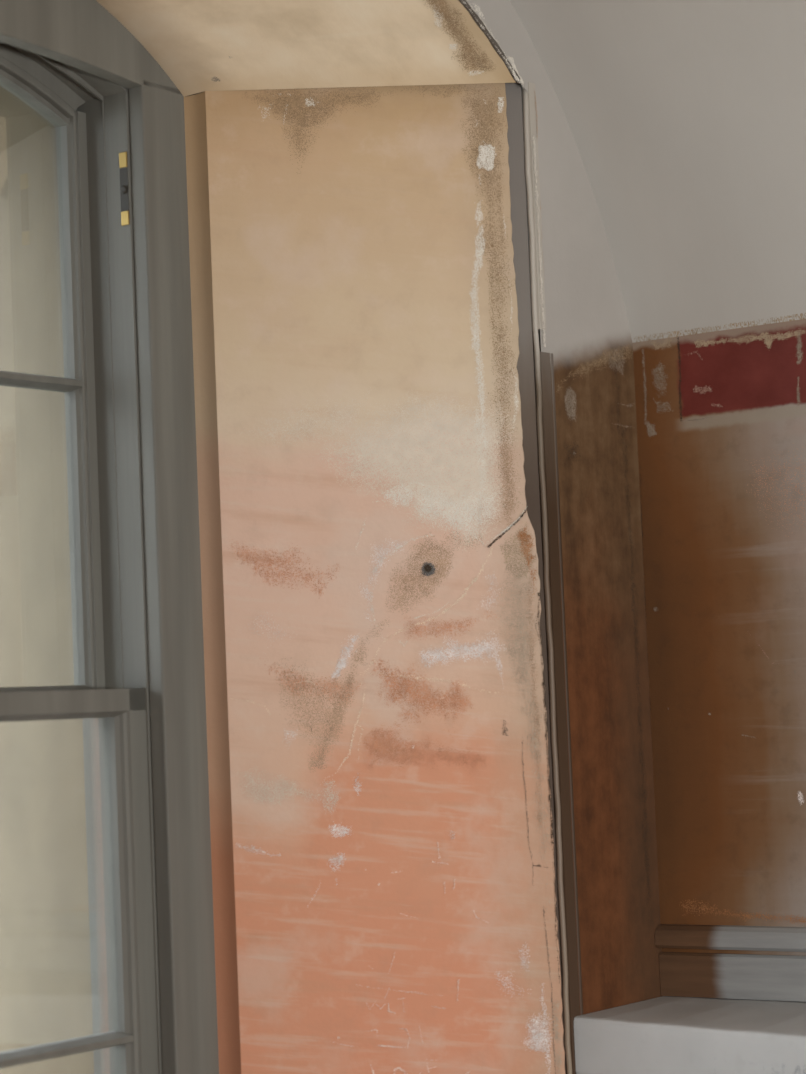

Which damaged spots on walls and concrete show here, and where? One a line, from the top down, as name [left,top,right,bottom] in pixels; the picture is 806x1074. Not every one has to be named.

water stain [242,0,523,525]
peeling [624,337,673,437]
peeling [691,328,806,364]
water stain [240,520,480,838]